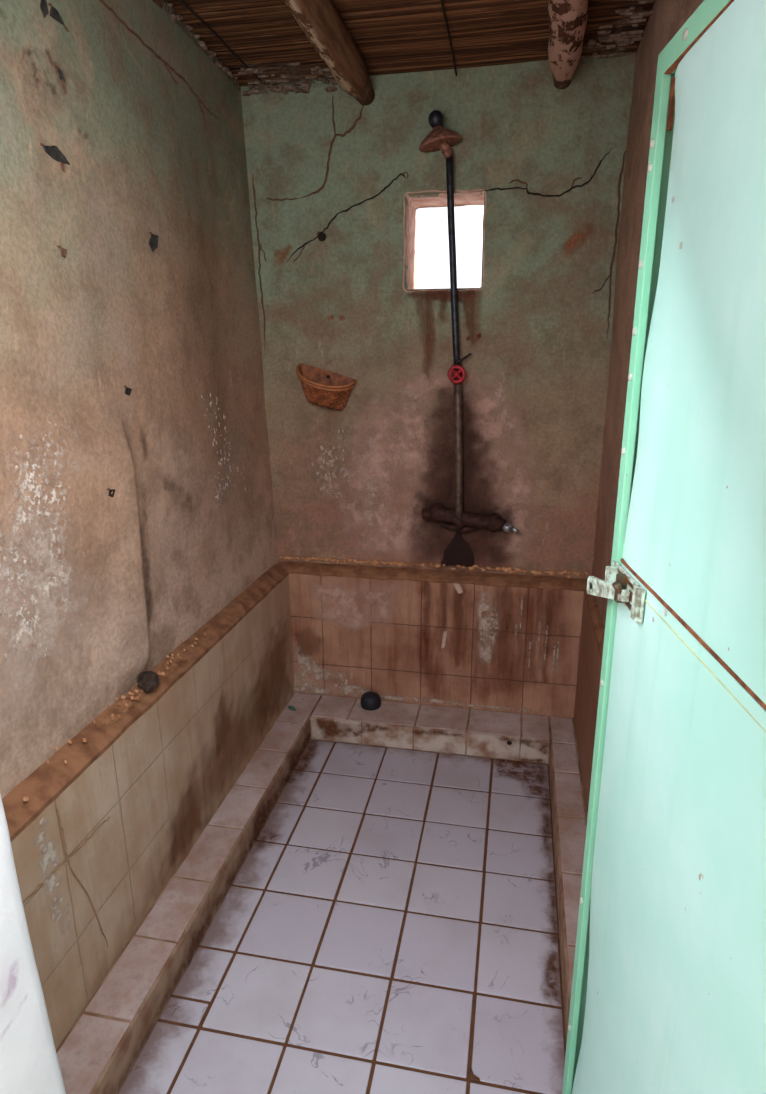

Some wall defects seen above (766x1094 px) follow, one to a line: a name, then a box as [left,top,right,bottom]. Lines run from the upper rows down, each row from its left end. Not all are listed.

spalling [40,0,69,32]
spalling [581,0,654,58]
spalling [40,143,70,172]
crack [252,98,409,355]
crack [482,148,626,338]
damp [341,373,533,567]
damp [478,593,499,662]
damp [260,635,367,718]
crack [22,809,110,948]